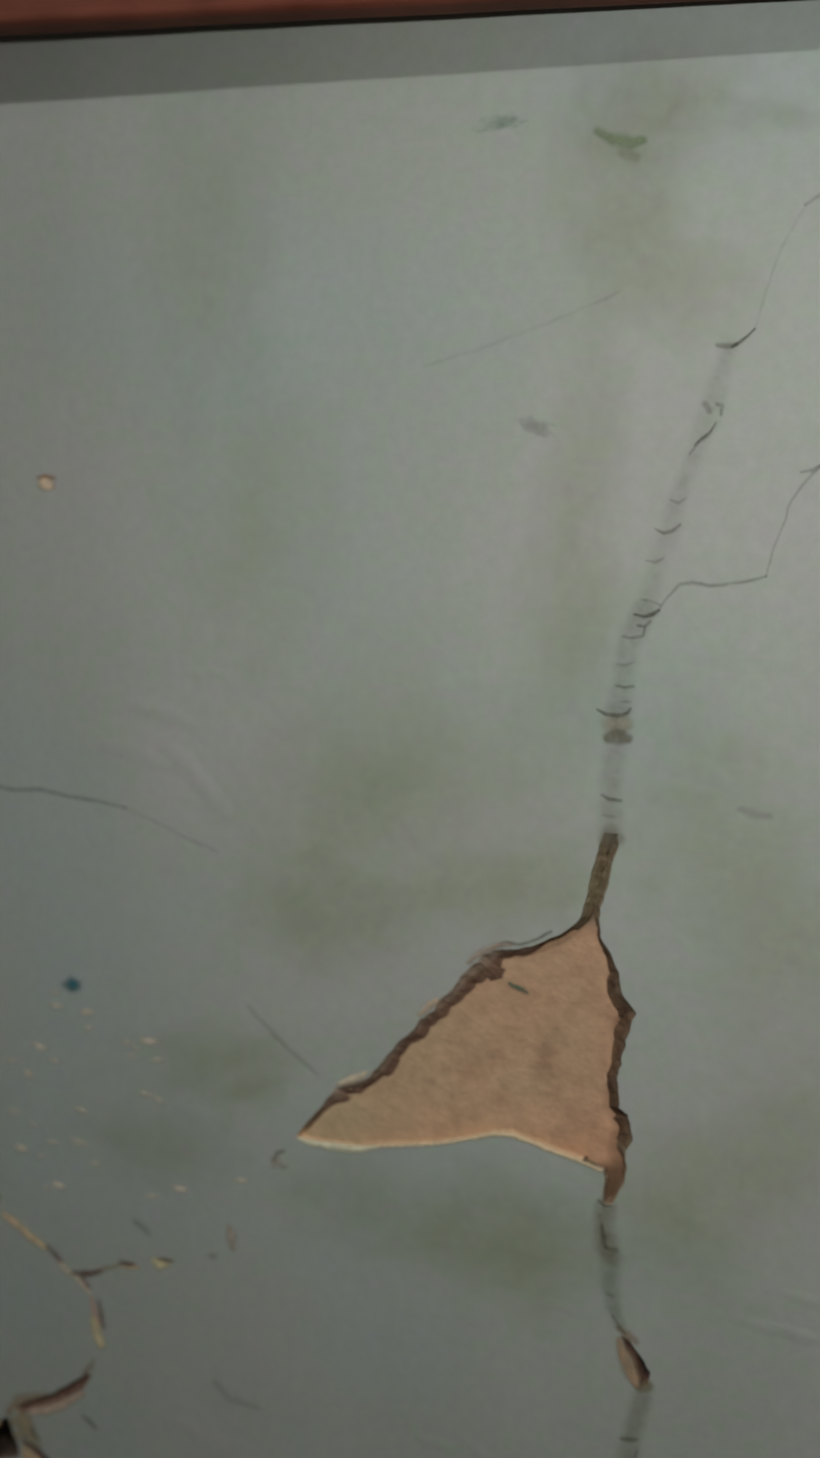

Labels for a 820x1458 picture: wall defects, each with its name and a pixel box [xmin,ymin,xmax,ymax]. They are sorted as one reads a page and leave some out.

crack [601,711,630,741]
crack [570,833,619,930]
peeling [296,909,636,1198]
crack [586,1139,627,1205]
crack [617,1332,650,1389]
spalling [0,1373,91,1458]